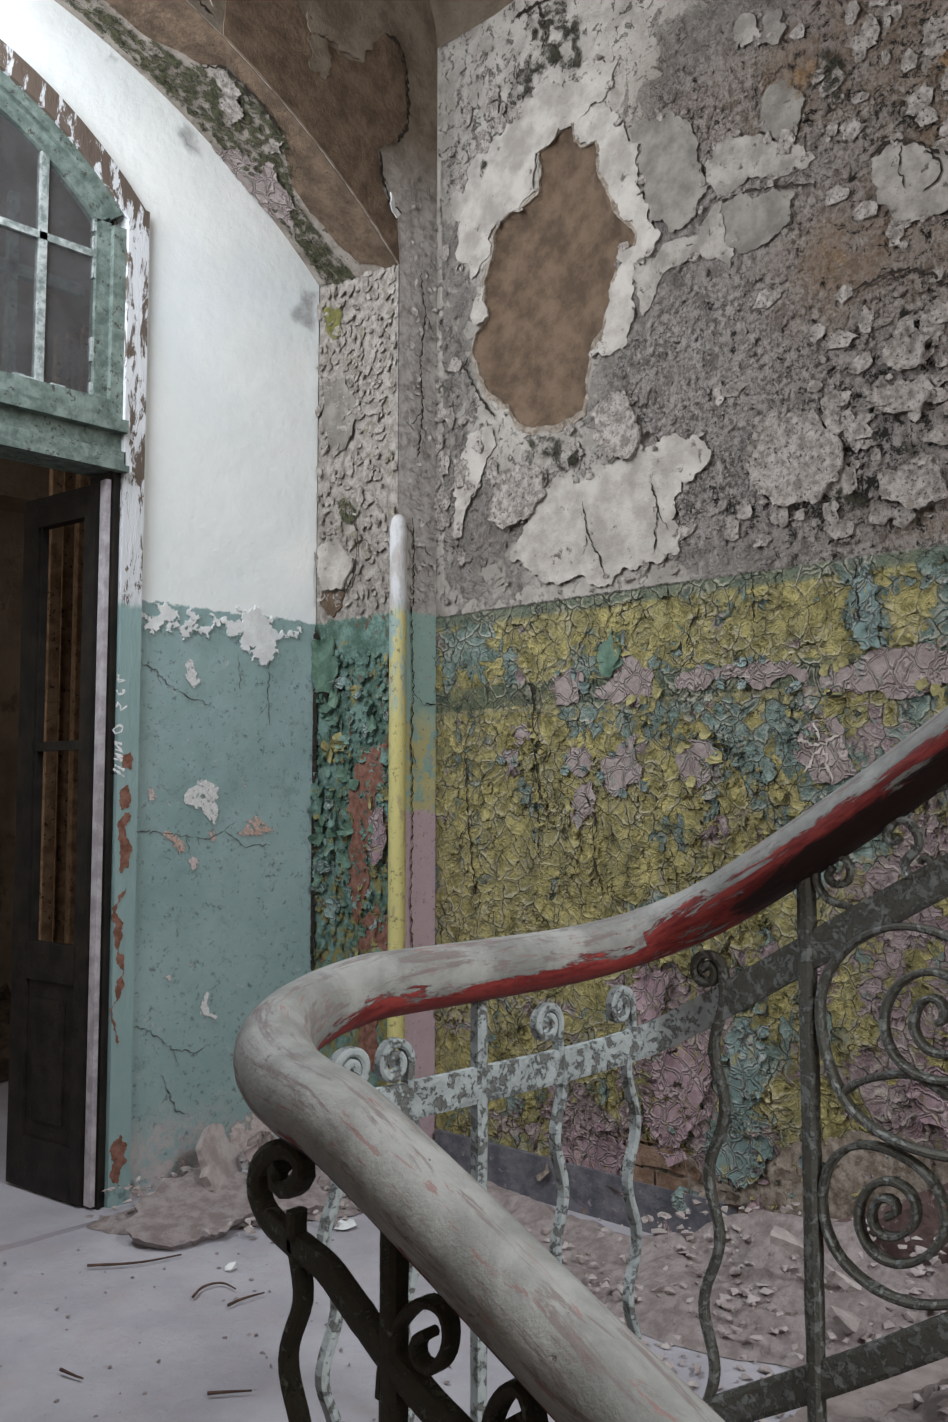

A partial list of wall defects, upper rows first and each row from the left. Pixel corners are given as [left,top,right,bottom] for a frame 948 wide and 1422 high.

flaking render [104,0,948,968]
crack [142,653,270,723]
crack [137,821,271,850]
crack [310,687,328,970]
spalling [110,751,157,1044]
peeling [597,910,795,1025]
peeling [433,987,561,1073]